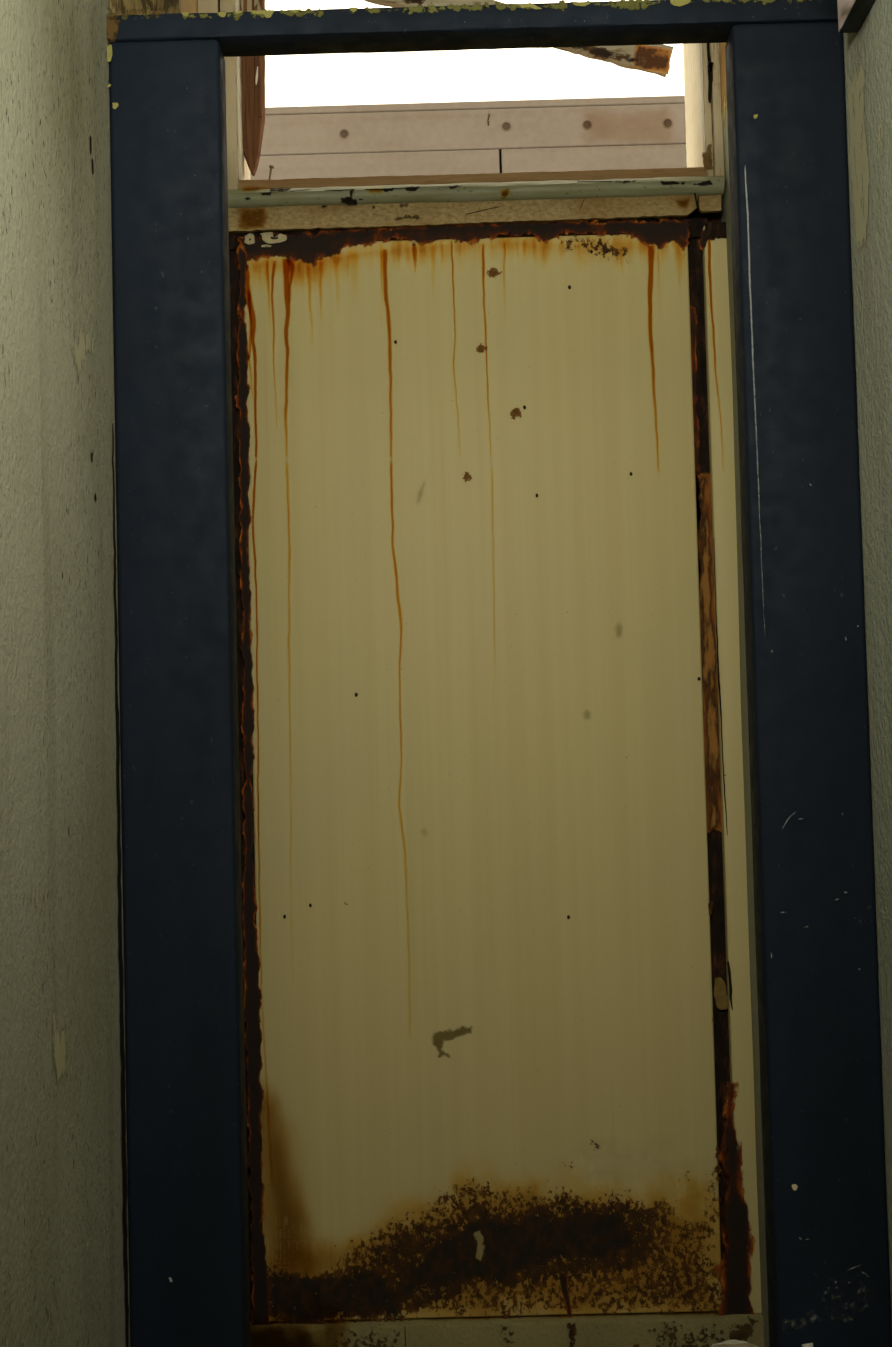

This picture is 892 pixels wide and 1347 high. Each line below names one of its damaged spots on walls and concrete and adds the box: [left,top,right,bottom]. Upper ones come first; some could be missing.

spalling [109,0,324,21]
spalling [340,0,811,14]
peeling [572,46,637,62]
peeling [713,43,727,130]
corrosion [235,219,755,1347]